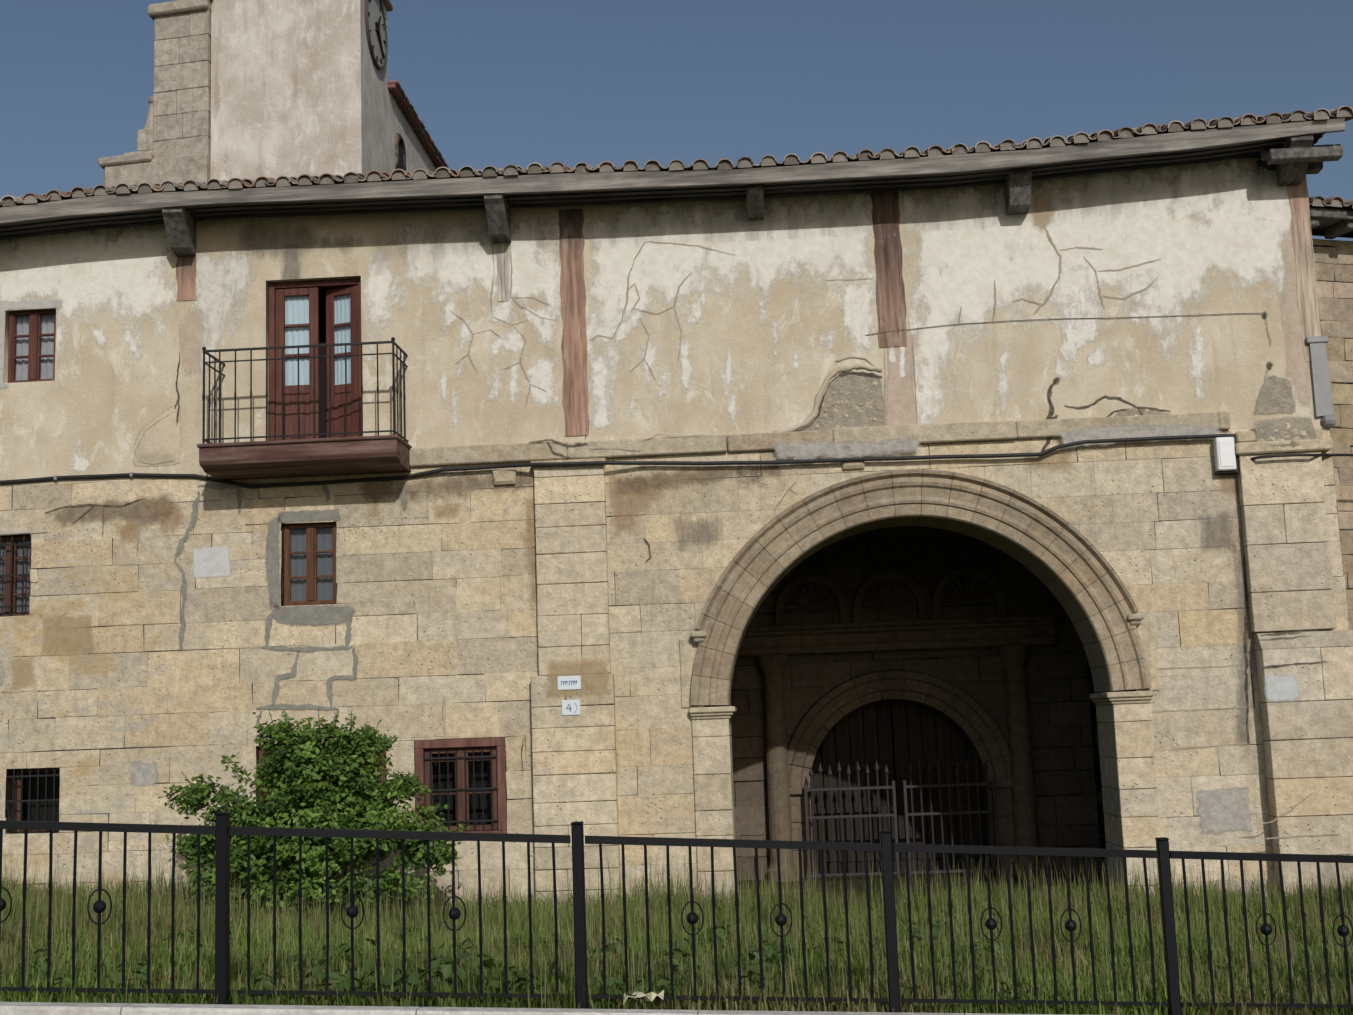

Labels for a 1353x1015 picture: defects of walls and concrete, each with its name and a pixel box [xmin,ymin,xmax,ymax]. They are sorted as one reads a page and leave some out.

peeling [0,224,257,373]
crack [448,243,553,409]
crack [591,241,736,380]
peeling [587,160,1316,446]
crack [958,221,1161,326]
peeling [72,440,104,474]
crack [529,434,701,458]
crack [1030,382,1171,457]